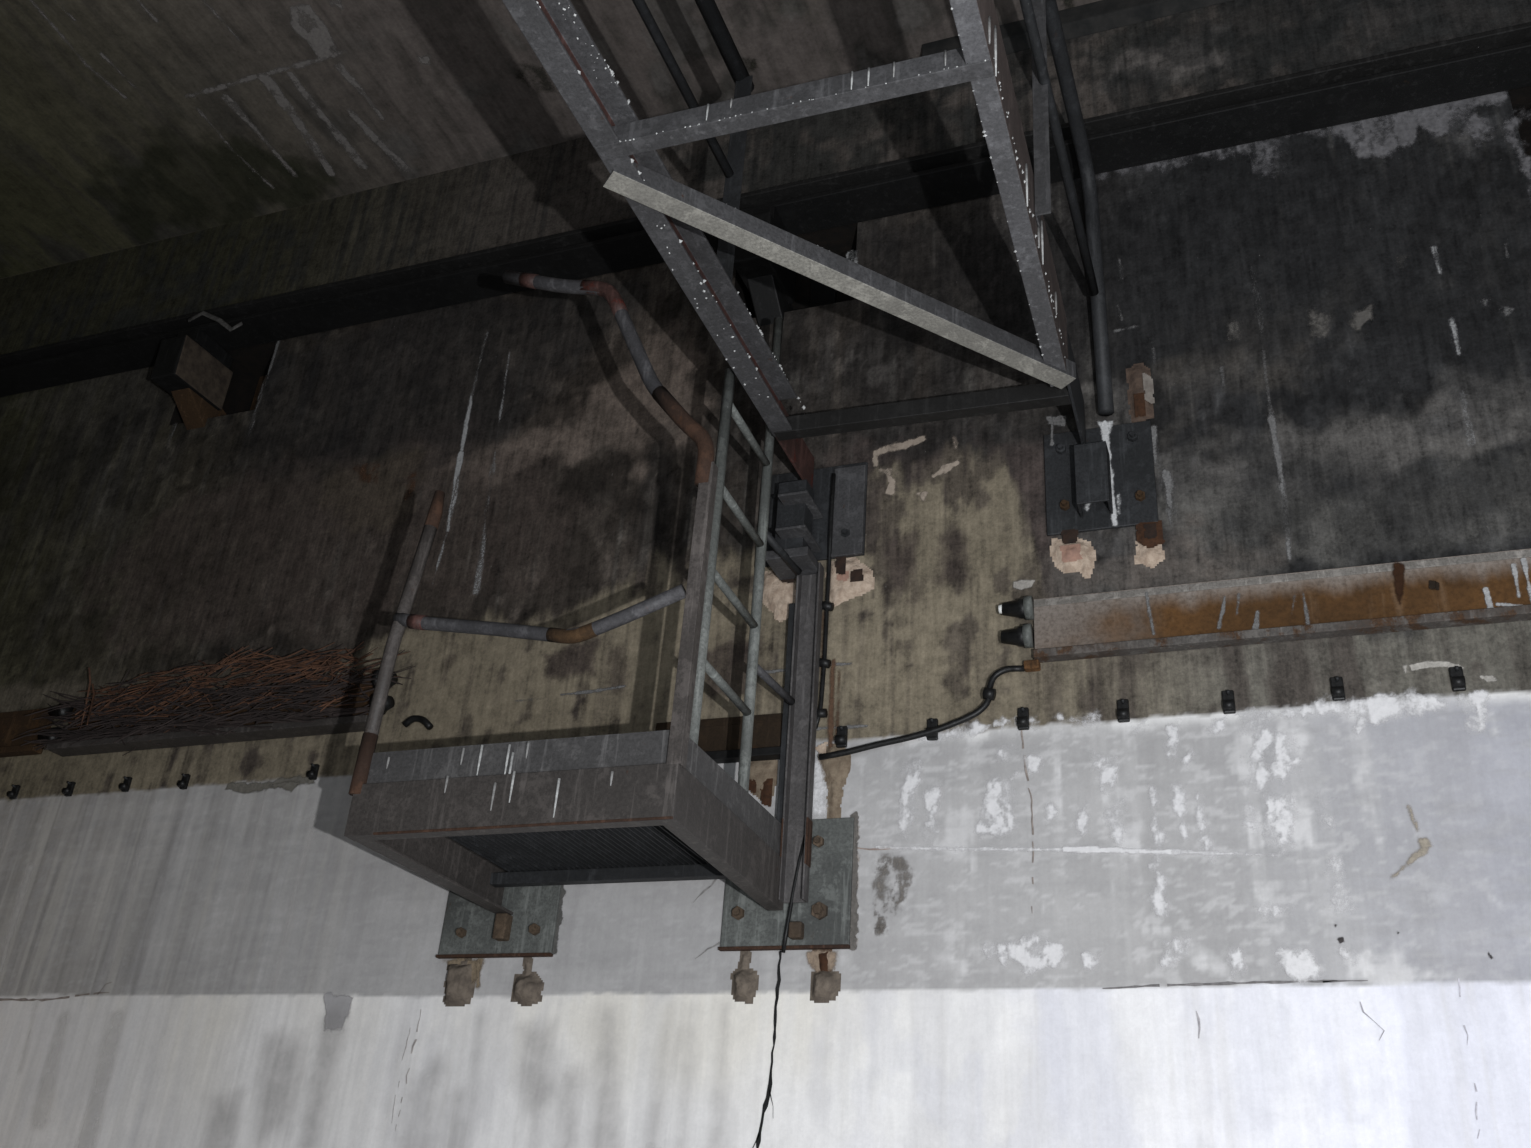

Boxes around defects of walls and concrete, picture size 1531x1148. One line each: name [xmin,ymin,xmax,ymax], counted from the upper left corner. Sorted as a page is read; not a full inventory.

water stain [1264,357,1286,497]
spalling [1050,529,1096,579]
spalling [1134,520,1165,568]
spalling [763,570,796,622]
spalling [825,556,875,607]
corrosion [1393,563,1405,604]
peeling [975,755,1041,836]
peeling [1172,785,1213,857]
peeling [1245,732,1301,853]
peeling [1275,948,1320,982]
crack [0,982,112,1002]
crack [753,951,782,1148]